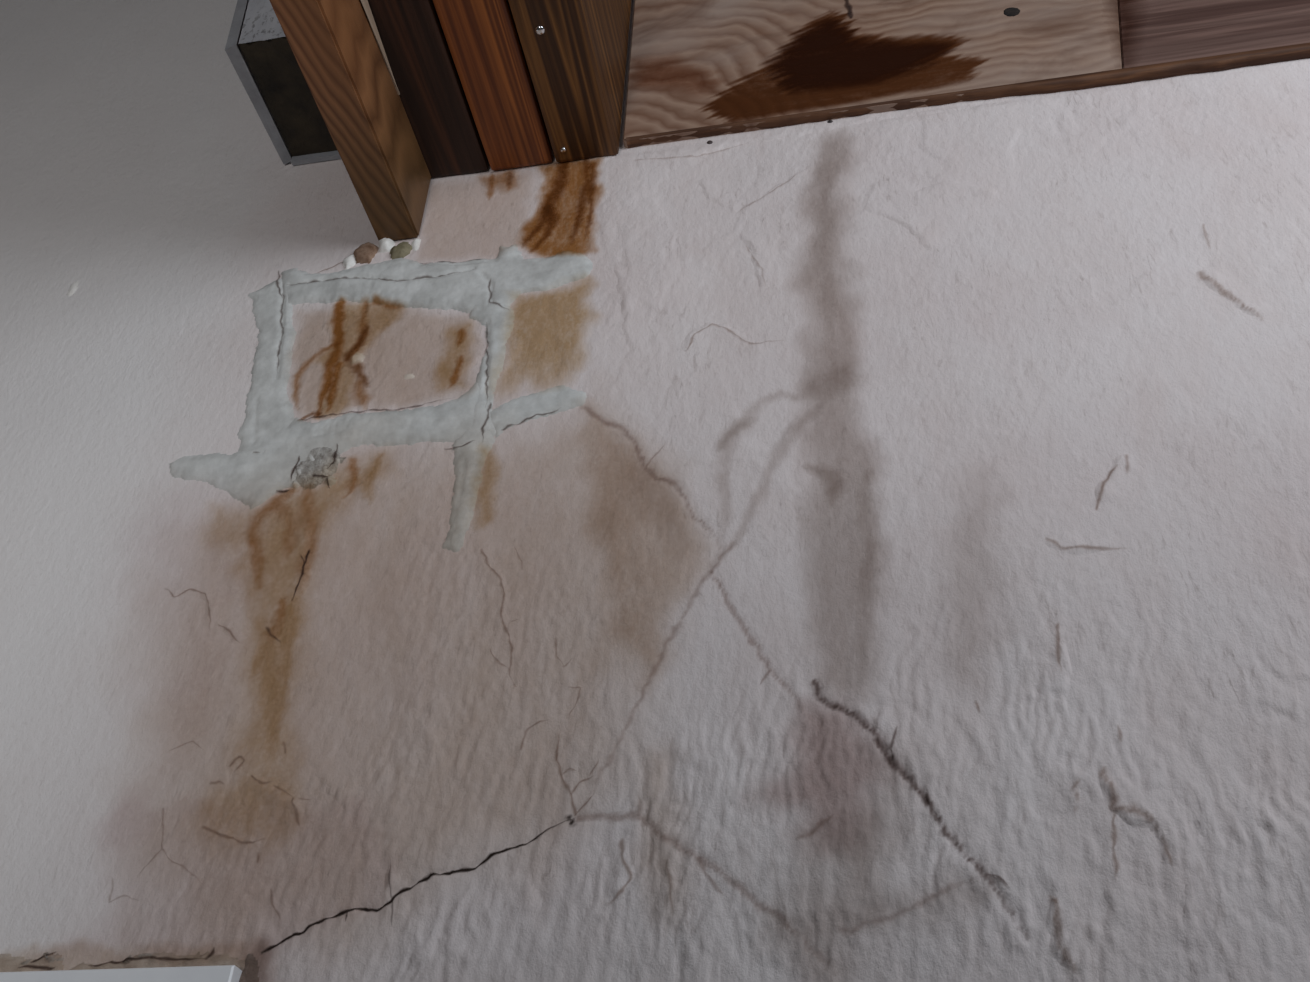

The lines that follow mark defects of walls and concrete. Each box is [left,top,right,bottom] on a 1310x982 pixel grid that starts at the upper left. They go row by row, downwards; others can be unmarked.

water stain [706,14,981,119]
spalling [342,238,421,270]
spalling [349,352,365,364]
spalling [280,447,346,492]
crack [267,817,573,950]
spalling [0,950,245,972]